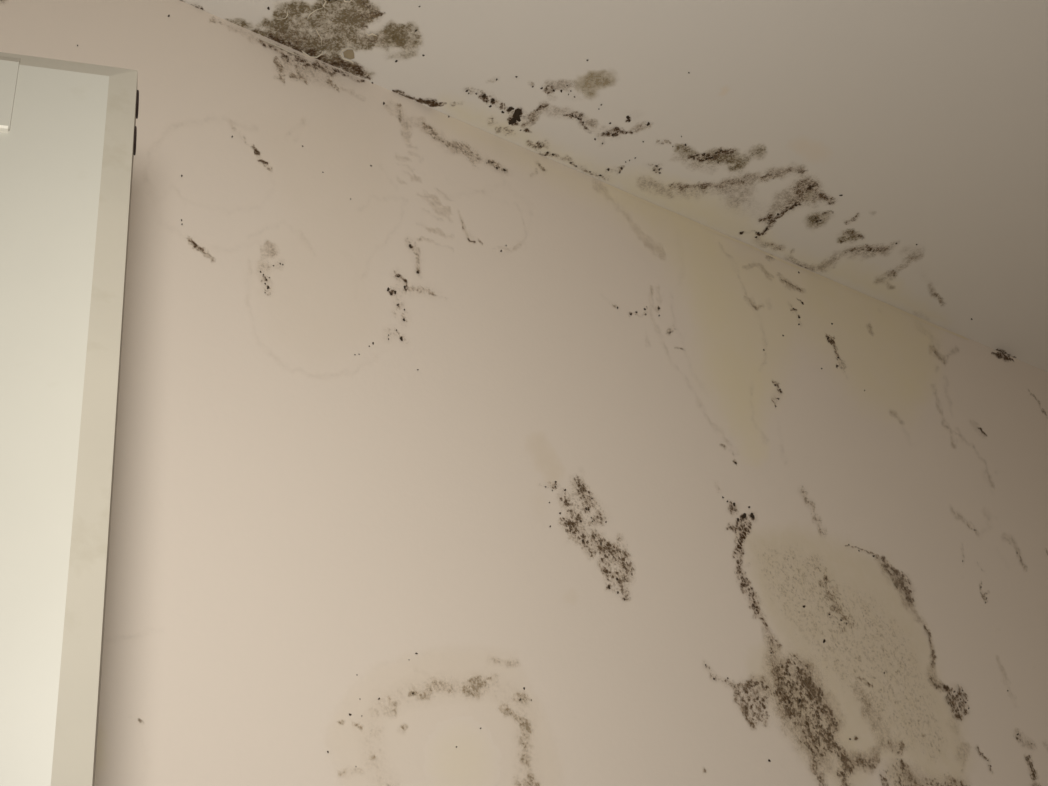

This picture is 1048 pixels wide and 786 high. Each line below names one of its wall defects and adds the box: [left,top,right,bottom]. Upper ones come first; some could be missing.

leakage [227,0,958,472]
leakage [320,640,567,786]
leakage [522,430,634,601]
leakage [705,491,992,786]